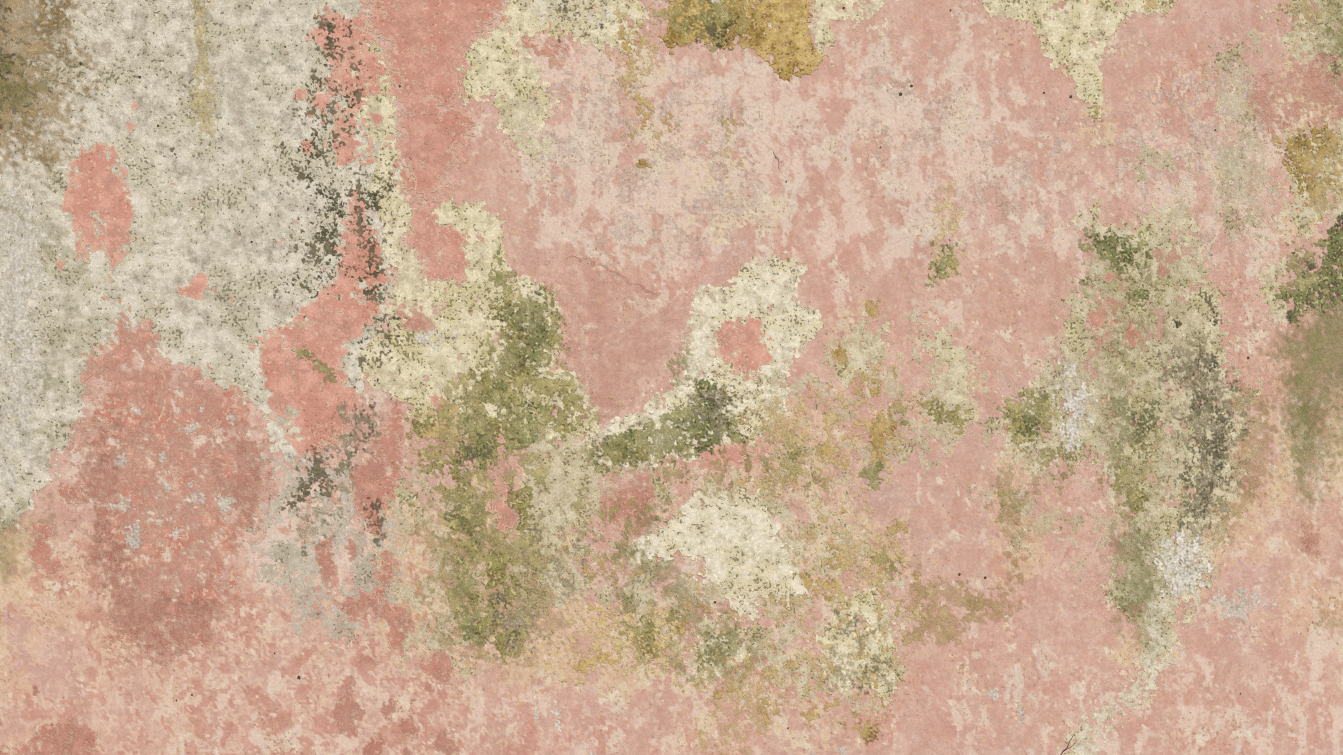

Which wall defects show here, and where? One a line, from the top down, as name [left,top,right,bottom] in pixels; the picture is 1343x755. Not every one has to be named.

peeling [807,0,888,67]
peeling [979,0,1177,152]
leakage [0,0,98,499]
peeling [589,79,789,275]
leakage [699,365,743,437]
leakage [1052,358,1098,456]
leakage [1148,291,1276,639]